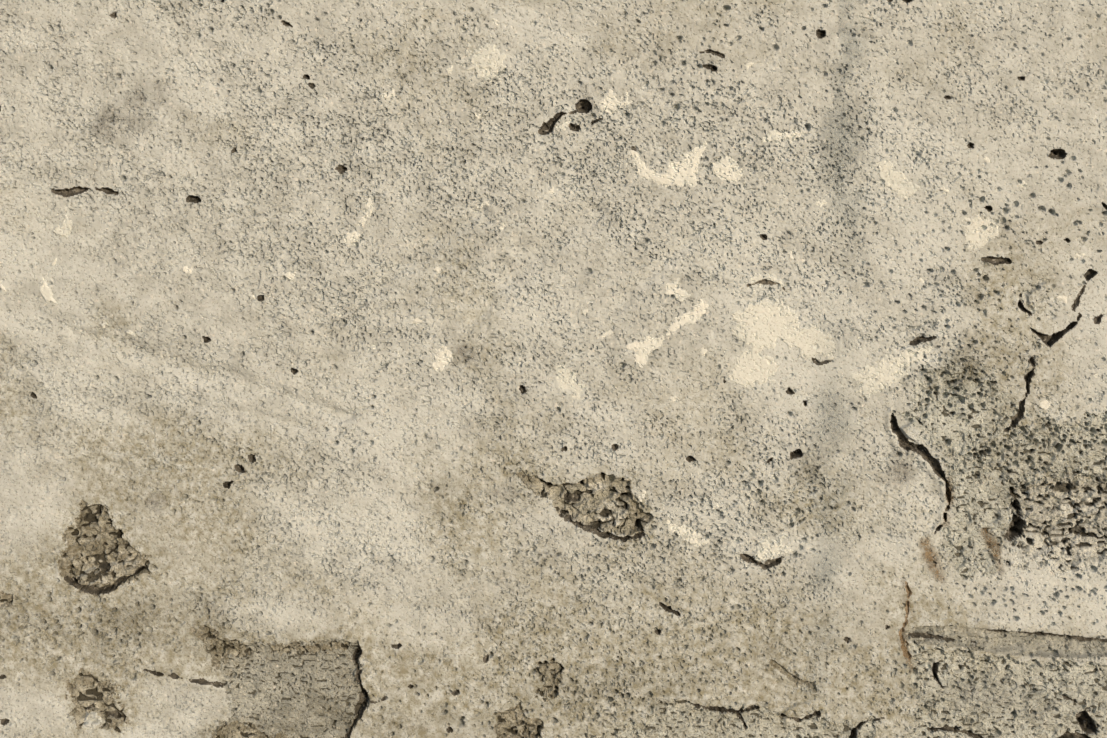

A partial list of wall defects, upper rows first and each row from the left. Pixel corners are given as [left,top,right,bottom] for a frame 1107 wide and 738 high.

crack [1004,356,1036,432]
spalling [57,499,152,597]
spalling [515,472,654,542]
peeling [666,520,709,547]
crack [890,413,951,534]
spalling [0,591,14,610]
spalling [143,625,386,738]